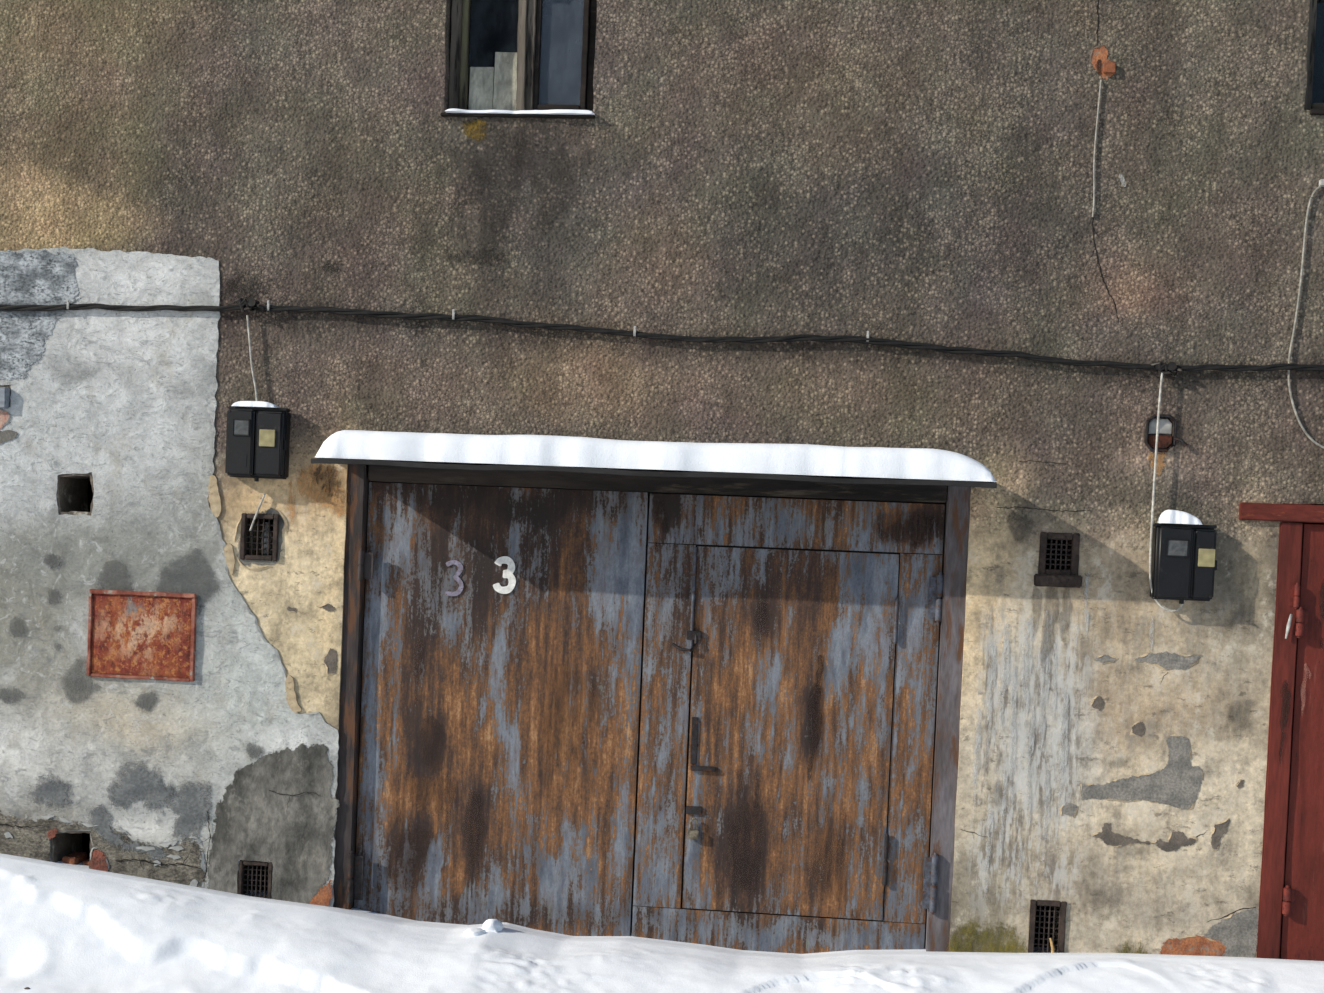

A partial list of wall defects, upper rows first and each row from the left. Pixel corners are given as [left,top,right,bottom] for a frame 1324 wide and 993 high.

crack [1096,0,1104,46]
spalling [1089,46,1116,79]
crack [1085,195,1119,323]
flaking render [208,475,288,575]
peeling [324,648,337,676]
peeling [1134,651,1202,671]
leakage [973,611,1068,866]
peeling [1060,734,1204,818]
flaking render [0,811,206,887]
peeling [1092,818,1230,852]
flaking render [310,880,333,906]
peeling [1160,908,1259,958]